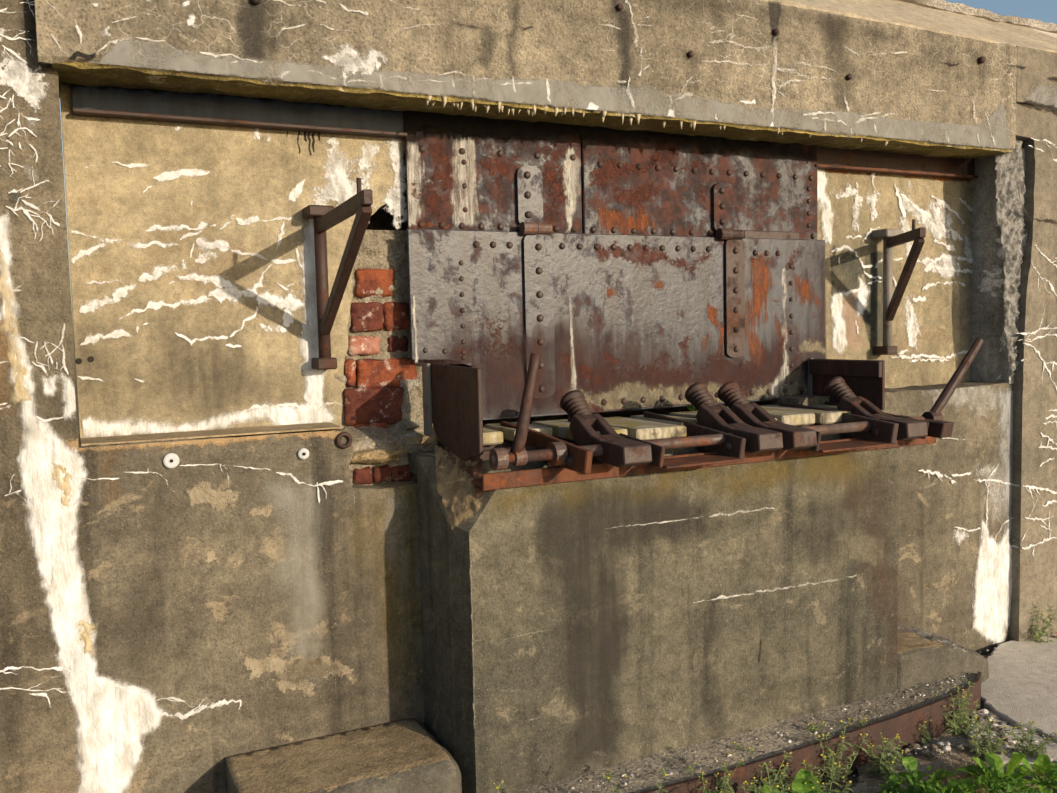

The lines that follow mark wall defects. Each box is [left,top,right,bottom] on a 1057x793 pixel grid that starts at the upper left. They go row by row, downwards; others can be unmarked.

crack [0,0,305,382]
rust [411,141,455,229]
damp [286,110,879,243]
rust [590,143,713,273]
flaking render [334,230,481,529]
rust [445,250,826,415]
damp [831,251,883,352]
crack [919,182,1057,555]
damp [0,215,334,793]
crack [85,443,343,503]
damp [973,522,1012,644]
peeling [242,655,354,697]